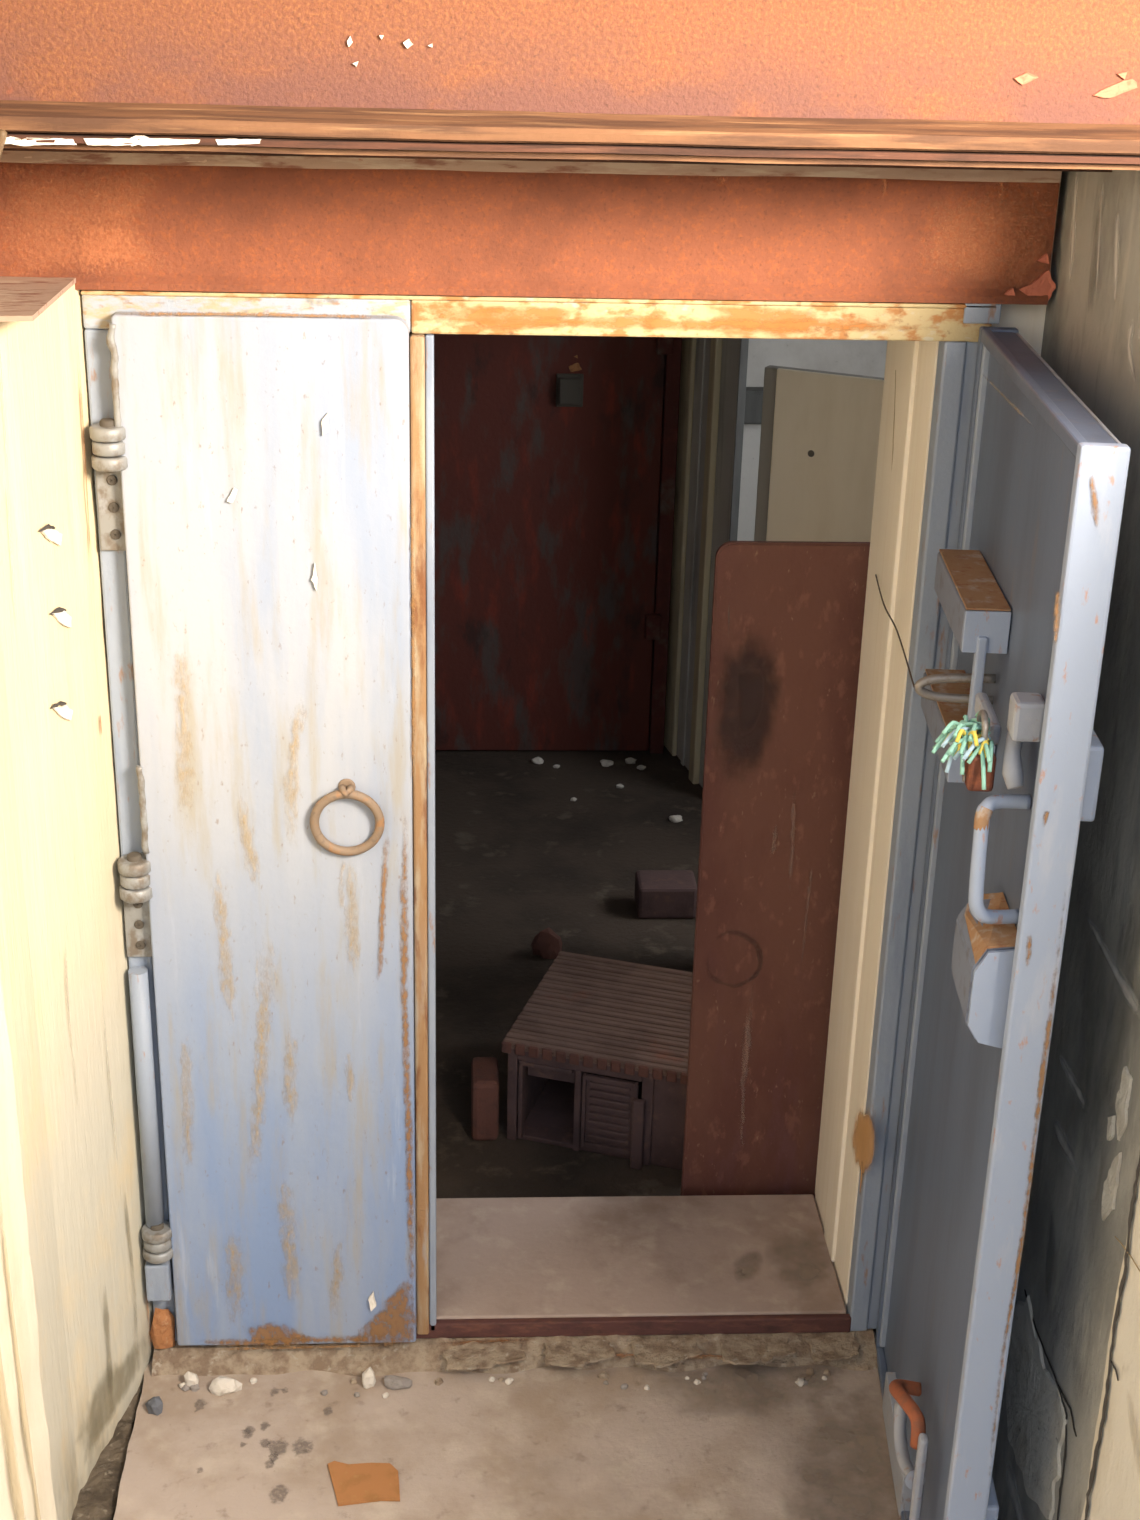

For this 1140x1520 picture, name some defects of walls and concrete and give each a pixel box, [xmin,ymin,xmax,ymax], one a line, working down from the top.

peeling [1014,72,1038,85]
peeling [1093,72,1137,98]
peeling [1005,253,1056,300]
rust [1090,478,1098,522]
rust [379,845,413,1267]
rust [1001,986,1054,1365]
rust [219,1286,416,1350]
spalling [1005,1295,1068,1520]